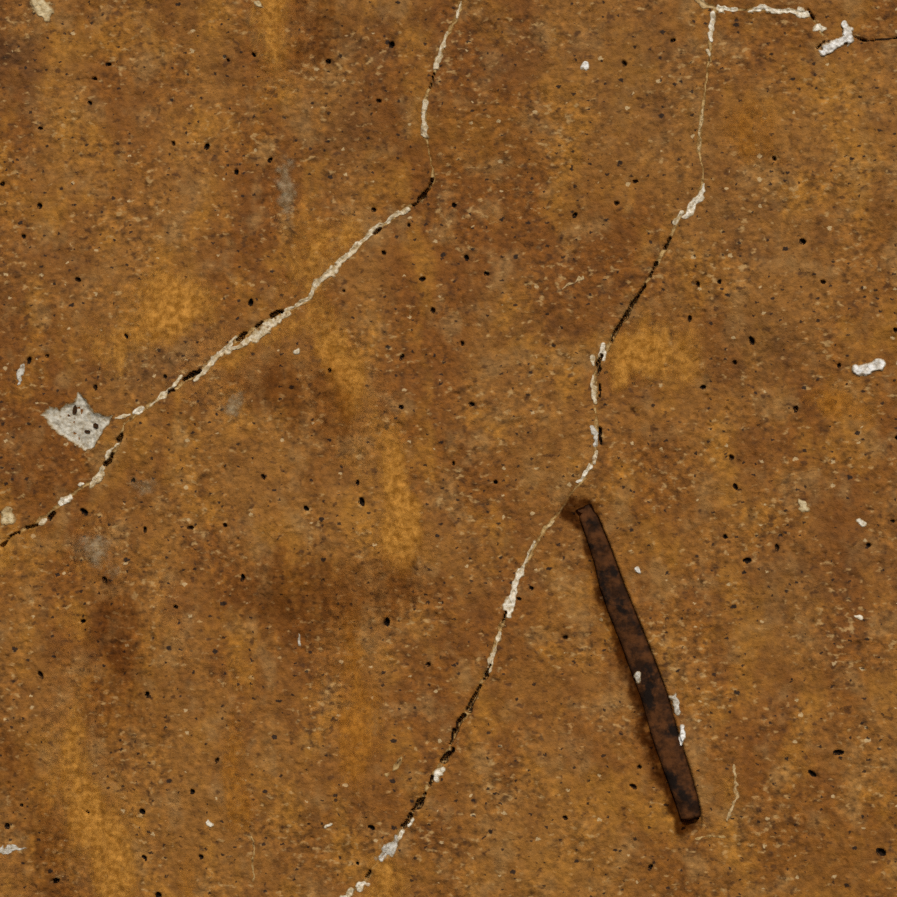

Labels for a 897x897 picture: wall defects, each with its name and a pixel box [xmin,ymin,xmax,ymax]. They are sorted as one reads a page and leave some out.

crack [853,35,897,43]
spalling [41,392,113,451]
crack [0,0,463,548]
crack [339,0,827,897]
corrosion [561,497,701,834]